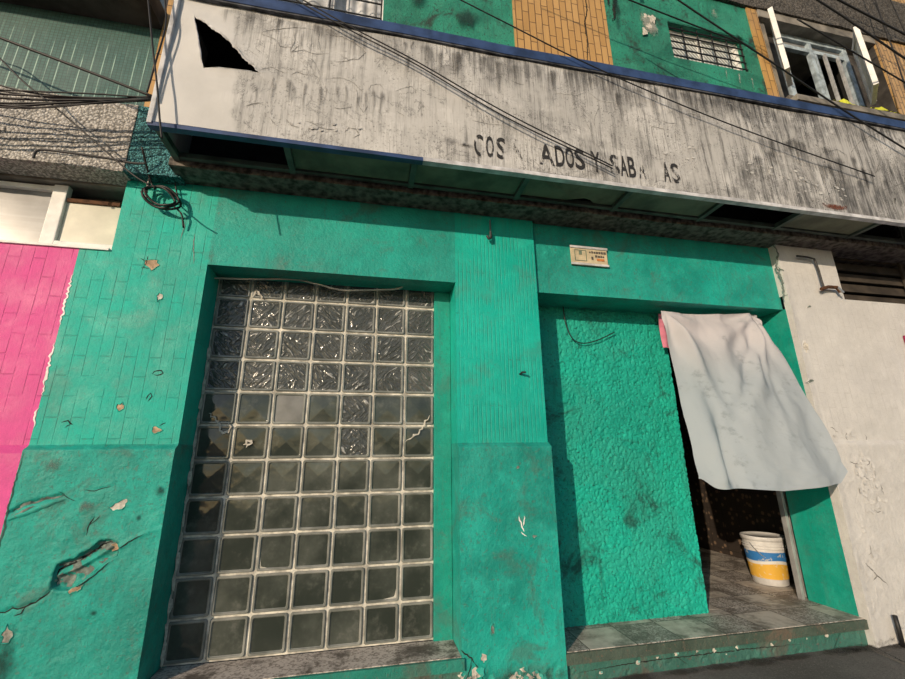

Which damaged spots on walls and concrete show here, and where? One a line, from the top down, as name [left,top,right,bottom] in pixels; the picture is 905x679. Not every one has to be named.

damp [458,10,475,25]
crack [584,0,616,59]
peeling [642,13,657,35]
flaking render [6,494,65,521]
peeling [108,498,128,511]
flaking render [50,539,120,595]
crack [76,536,140,587]
crack [0,589,52,616]
peeling [458,653,487,679]
peeling [509,667,543,679]